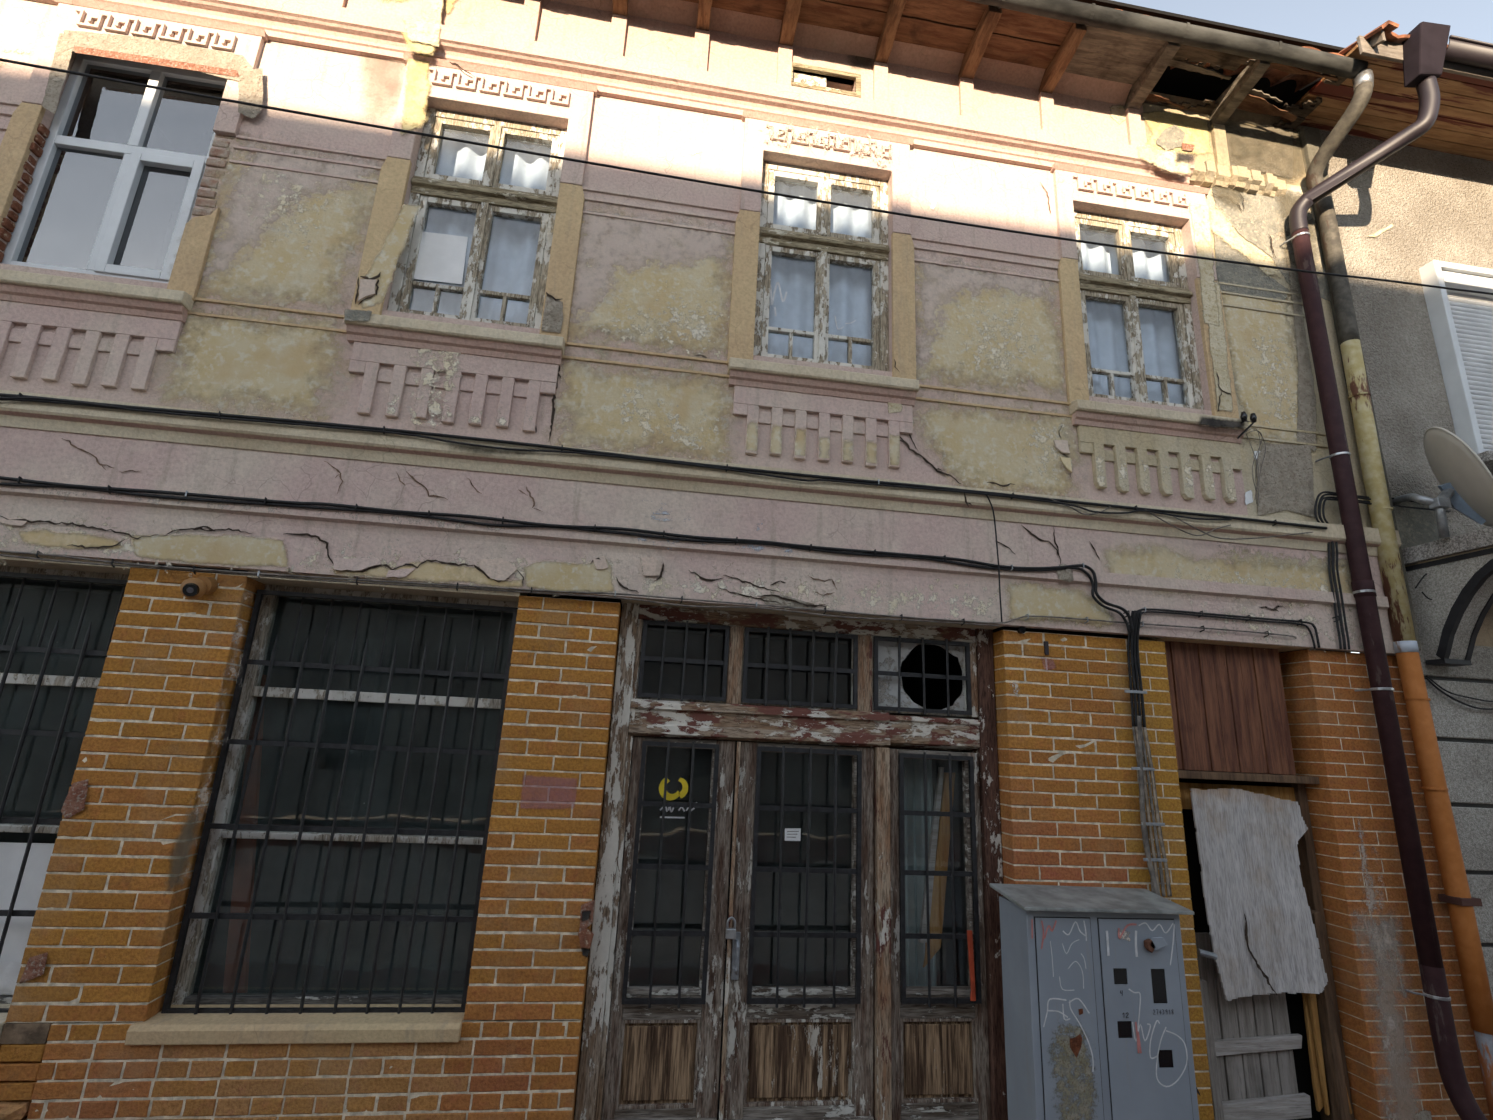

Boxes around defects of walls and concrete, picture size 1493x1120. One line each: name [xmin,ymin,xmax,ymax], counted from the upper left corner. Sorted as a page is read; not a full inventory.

spalling [0,30,263,262]
spalling [1110,105,1211,174]
peeling [160,134,420,421]
peeling [541,209,900,465]
peeling [913,258,1237,500]
peeling [1189,186,1331,451]
flaking render [0,516,1113,627]